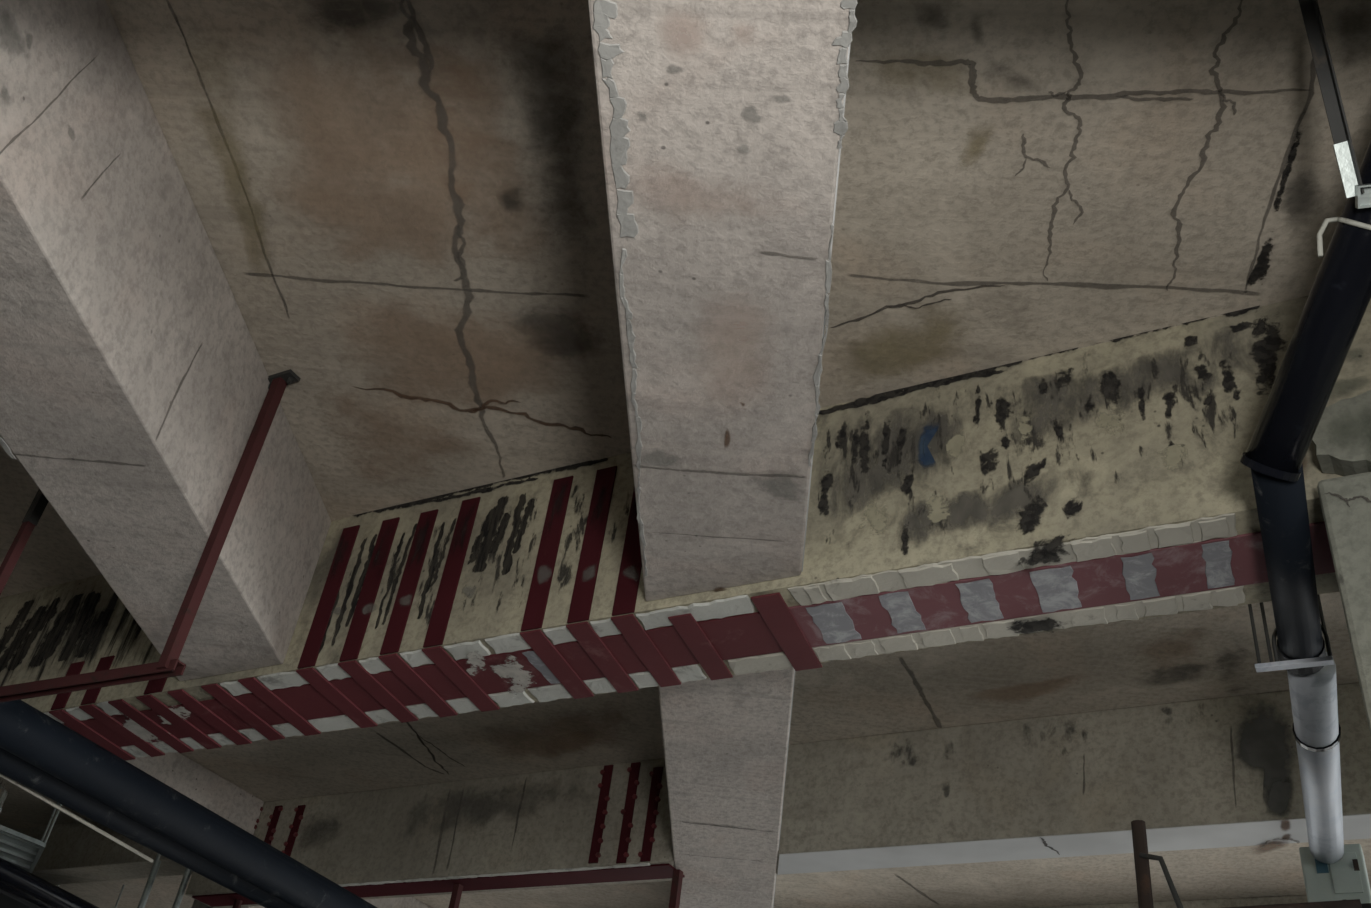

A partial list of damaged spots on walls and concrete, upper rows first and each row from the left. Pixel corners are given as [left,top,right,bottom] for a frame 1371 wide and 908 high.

spalling [832,0,858,148]
crack [857,0,1308,290]
crack [353,0,611,517]
crack [831,285,1005,328]
crack [819,305,1260,414]
water stain [1016,351,1213,442]
water stain [1214,318,1286,395]
water stain [833,411,960,511]
water stain [903,481,1051,543]